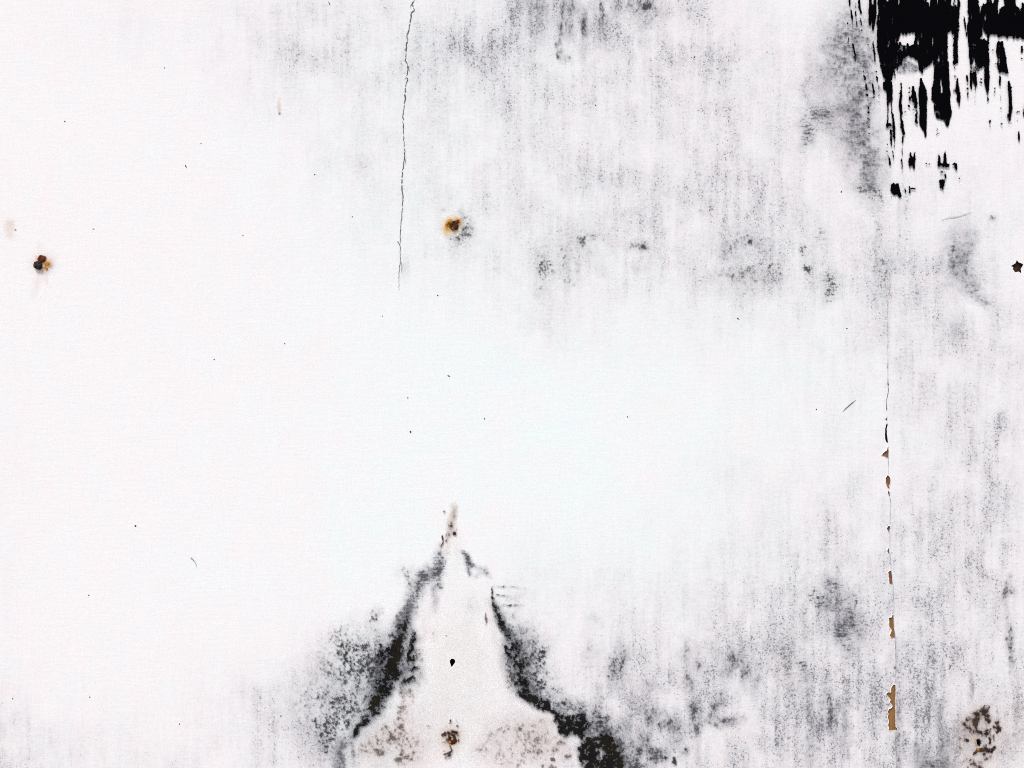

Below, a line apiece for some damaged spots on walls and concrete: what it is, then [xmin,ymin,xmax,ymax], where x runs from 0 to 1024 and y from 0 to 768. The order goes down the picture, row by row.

peeling [847,0,1024,190]
crack [397,1,415,278]
peeling [890,183,916,198]
rust [443,218,461,235]
leakage [462,551,489,575]
spalling [888,614,896,638]
leakage [304,551,446,768]
leakage [480,586,735,768]
leakage [728,652,758,681]
spalling [885,684,898,731]
rust [441,719,459,758]